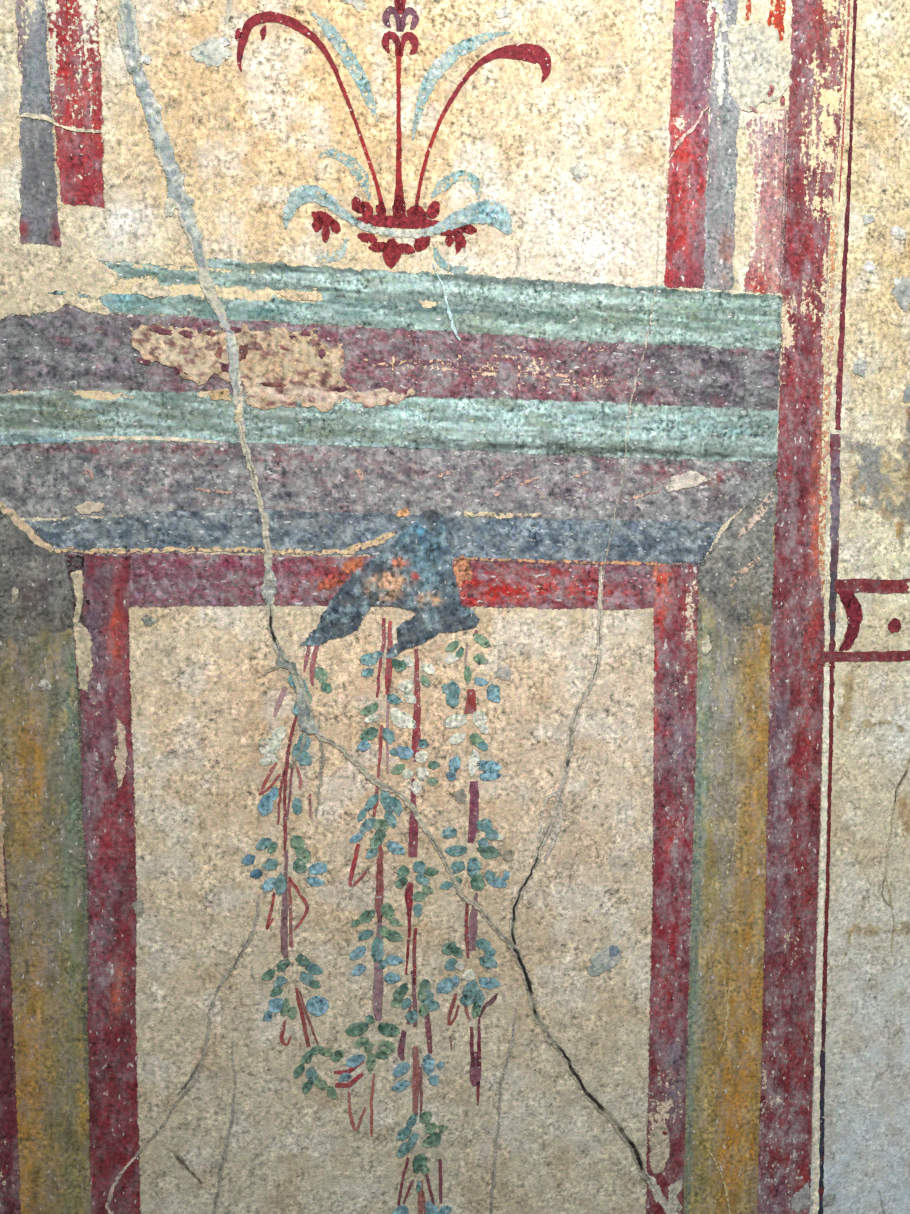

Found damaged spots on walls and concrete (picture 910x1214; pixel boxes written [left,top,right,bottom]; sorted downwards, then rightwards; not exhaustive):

peeling [723,22,793,113]
peeling [130,323,416,412]
crack [105,0,731,1214]
crack [881,757,910,955]